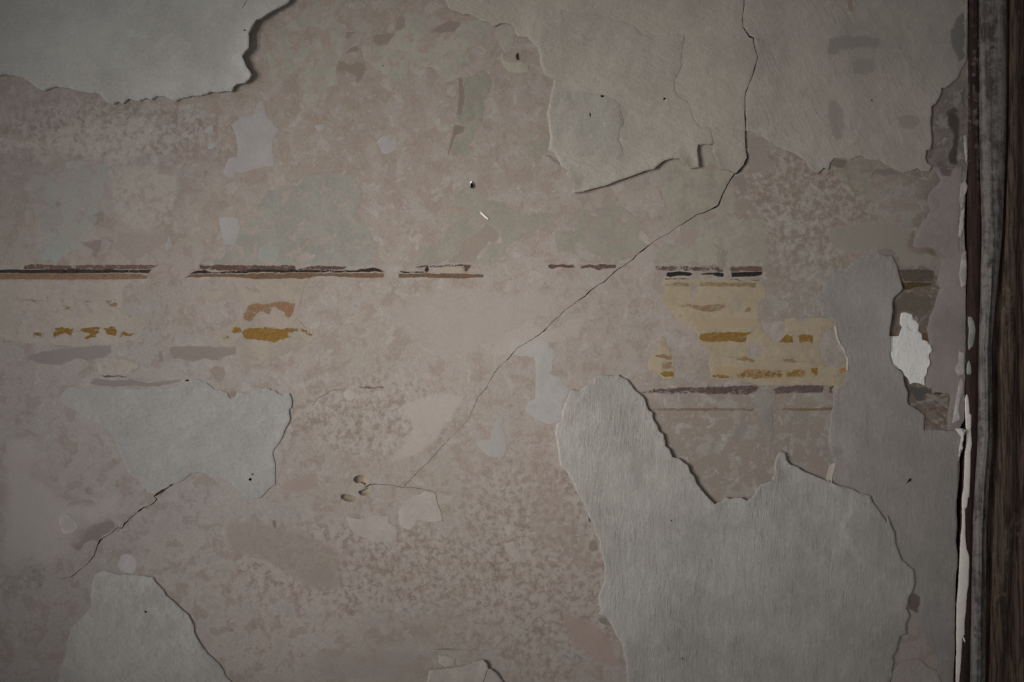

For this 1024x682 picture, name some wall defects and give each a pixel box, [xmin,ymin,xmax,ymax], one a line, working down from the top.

peeling [0,0,291,105]
crack [464,8,758,424]
peeling [427,0,976,682]
peeling [60,346,292,499]
crack [63,484,174,579]
crack [365,450,444,521]
peeling [58,570,232,682]